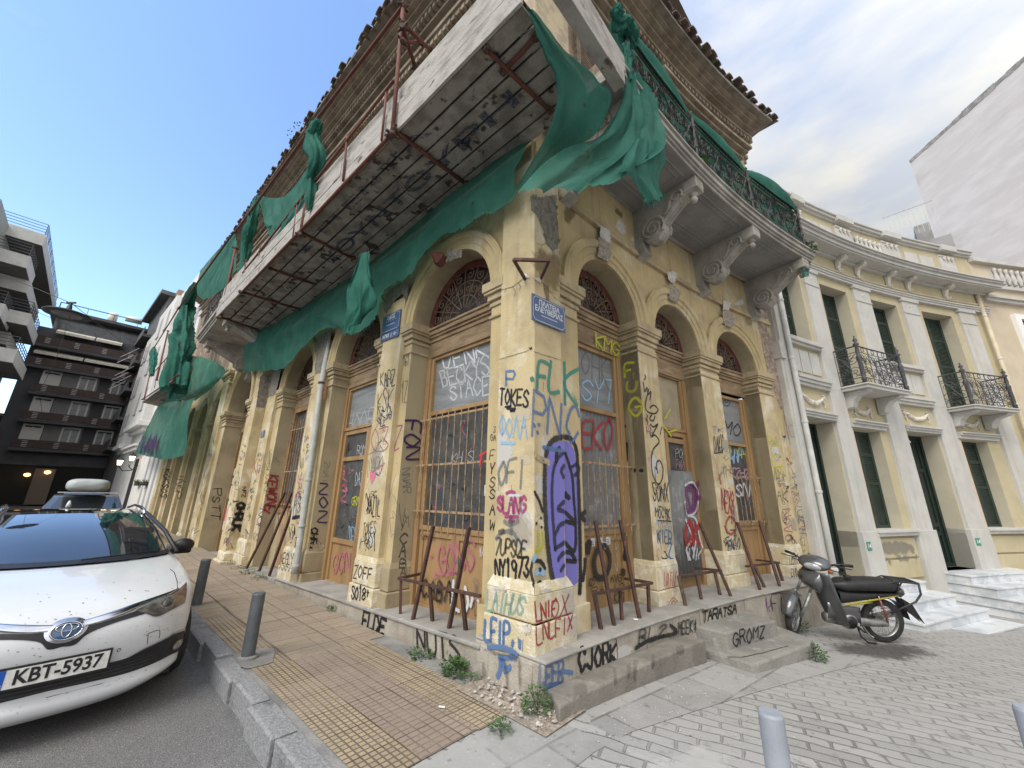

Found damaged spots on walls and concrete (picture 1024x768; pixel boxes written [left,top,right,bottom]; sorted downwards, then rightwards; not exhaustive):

flaking render [530,194,561,250]
flaking render [597,219,634,262]